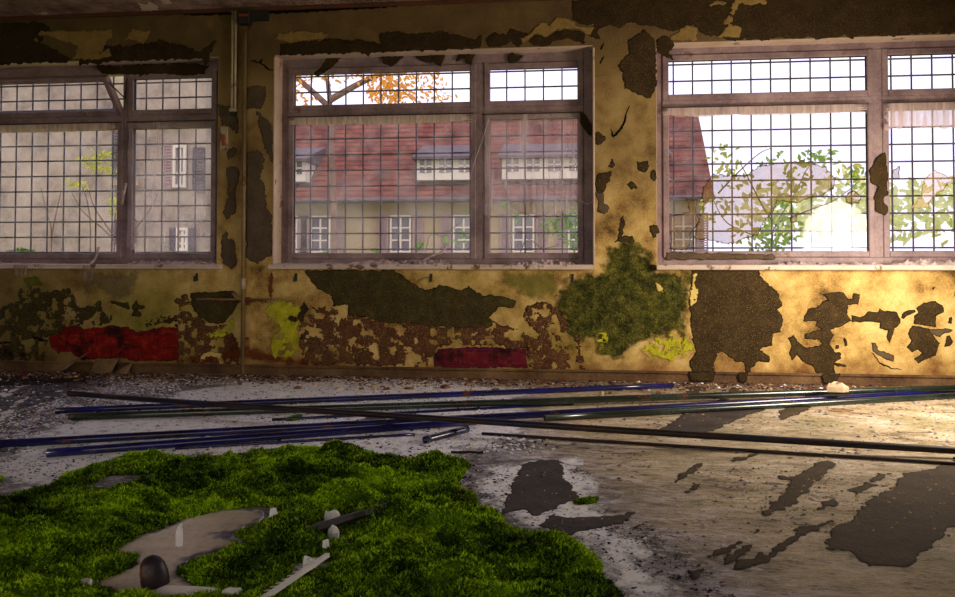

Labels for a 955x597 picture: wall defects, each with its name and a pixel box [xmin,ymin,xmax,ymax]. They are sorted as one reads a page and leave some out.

flaking render [136,0,173,11]
peeling [0,11,217,77]
peeling [280,0,955,98]
peeling [580,113,606,145]
peeling [218,85,273,269]
peeling [595,159,615,214]
peeling [637,160,657,181]
peeling [615,216,635,243]
spalling [0,286,239,364]
peeling [287,269,585,370]
peeling [666,251,953,374]